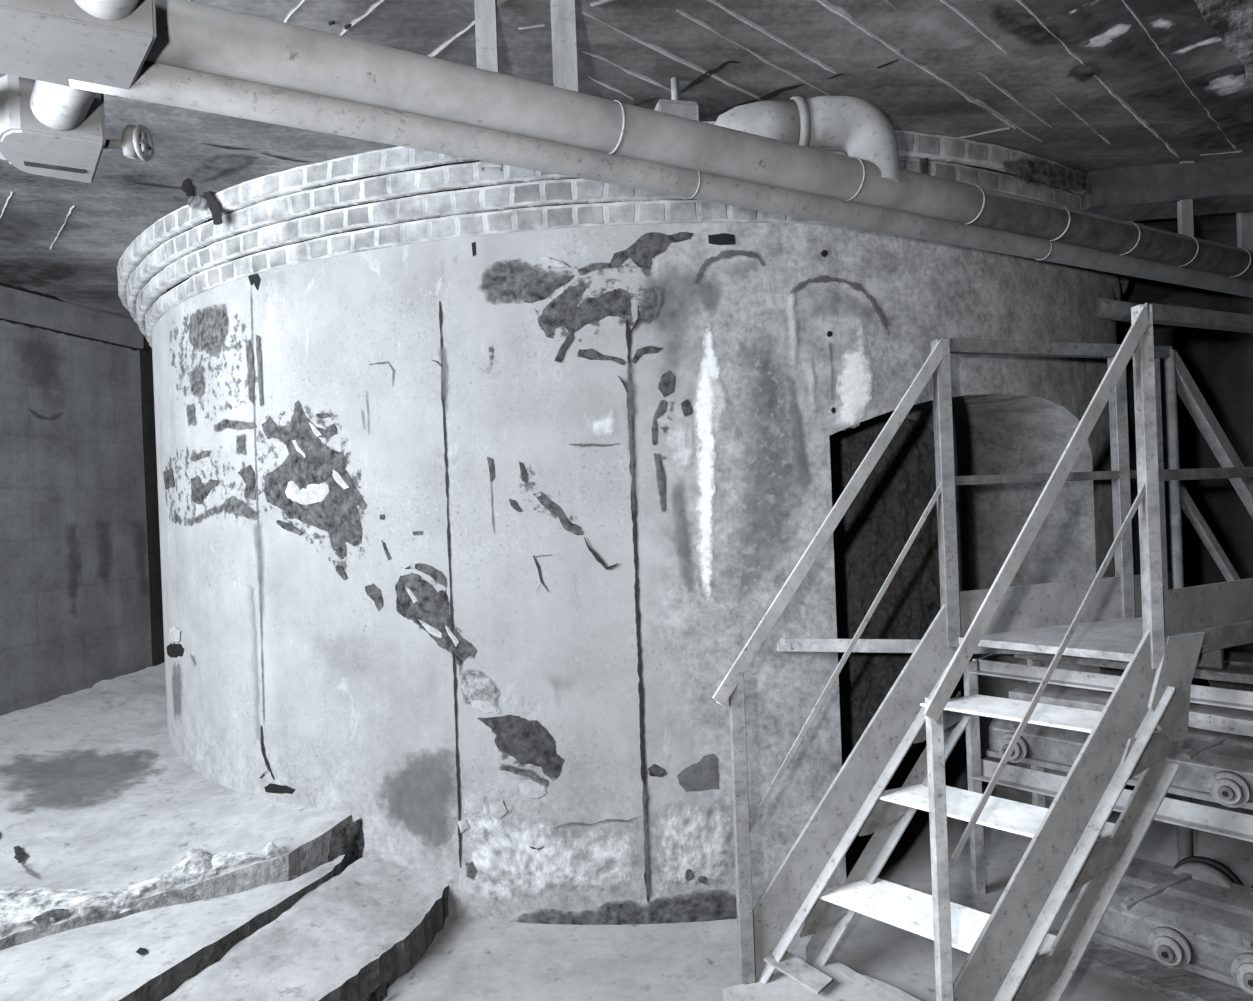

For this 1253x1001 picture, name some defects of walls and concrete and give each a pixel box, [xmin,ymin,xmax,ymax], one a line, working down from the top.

damp [993,0,1253,149]
spalling [481,232,693,363]
spalling [708,233,735,245]
spalling [163,305,367,580]
damp [667,331,726,597]
damp [742,293,815,583]
spalling [365,563,564,798]
crack [14,846,38,878]
damp [0,750,157,811]
spalling [0,841,288,937]
damp [385,751,453,844]
flaking render [458,754,737,925]